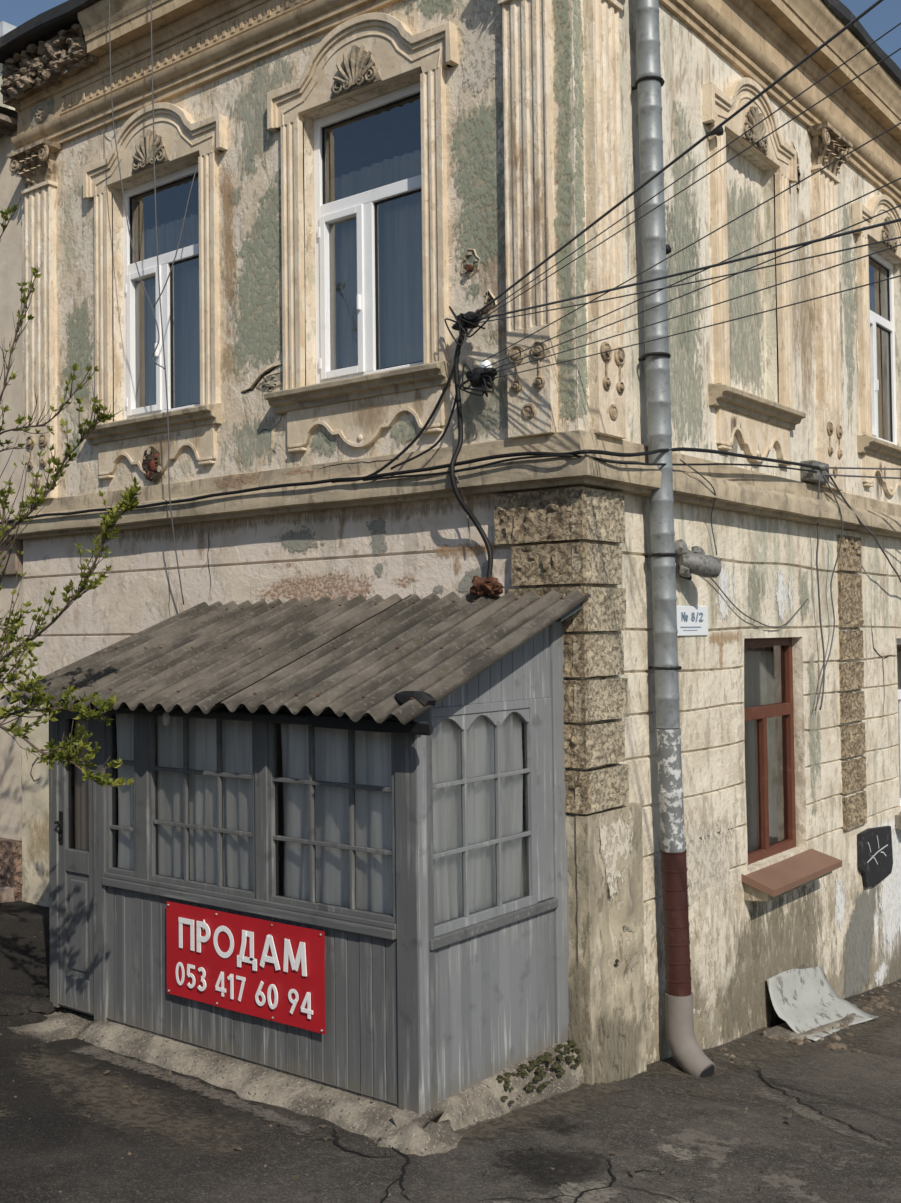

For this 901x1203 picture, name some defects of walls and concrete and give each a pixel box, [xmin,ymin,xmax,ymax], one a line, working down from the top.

peeling [227,54,294,206]
peeling [396,0,505,317]
peeling [230,167,283,392]
peeling [214,416,276,488]
flaking render [254,562,419,602]
damp [722,882,823,1044]
damp [844,885,901,998]